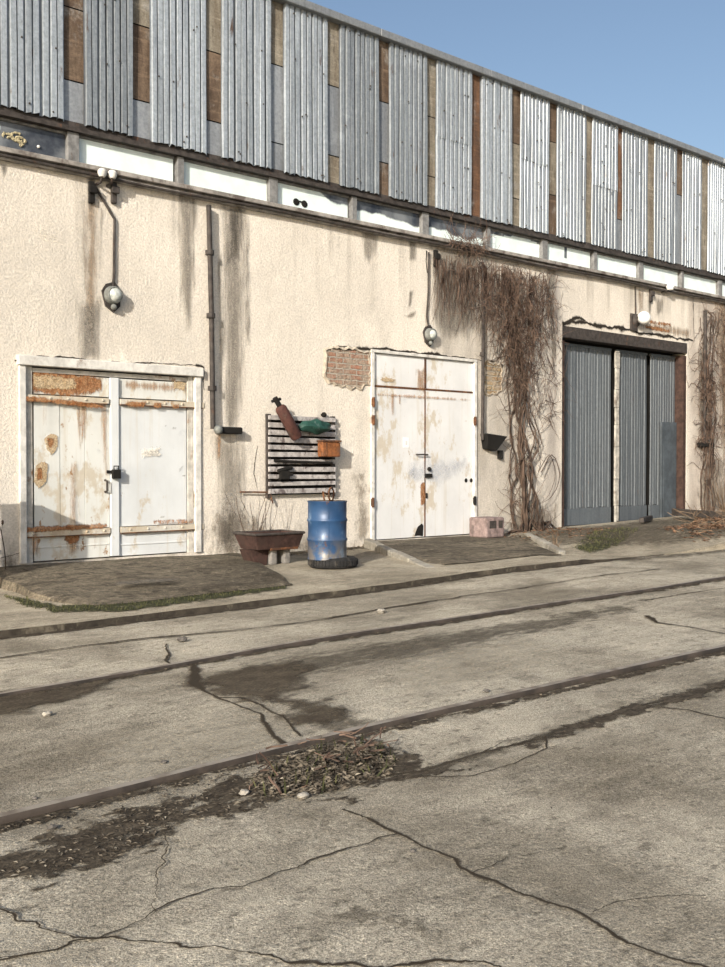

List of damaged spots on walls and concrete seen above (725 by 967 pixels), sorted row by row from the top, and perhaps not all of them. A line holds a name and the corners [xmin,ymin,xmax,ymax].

corrosion [34,434,58,489]
leakage [84,203,102,356]
corrosion [26,372,203,449]
corrosion [27,504,203,552]
leakage [181,196,195,315]
leakage [219,208,242,427]
leakage [221,444,240,549]
spalling [322,345,371,391]
corrosion [375,359,473,536]
crack [0,808,708,967]